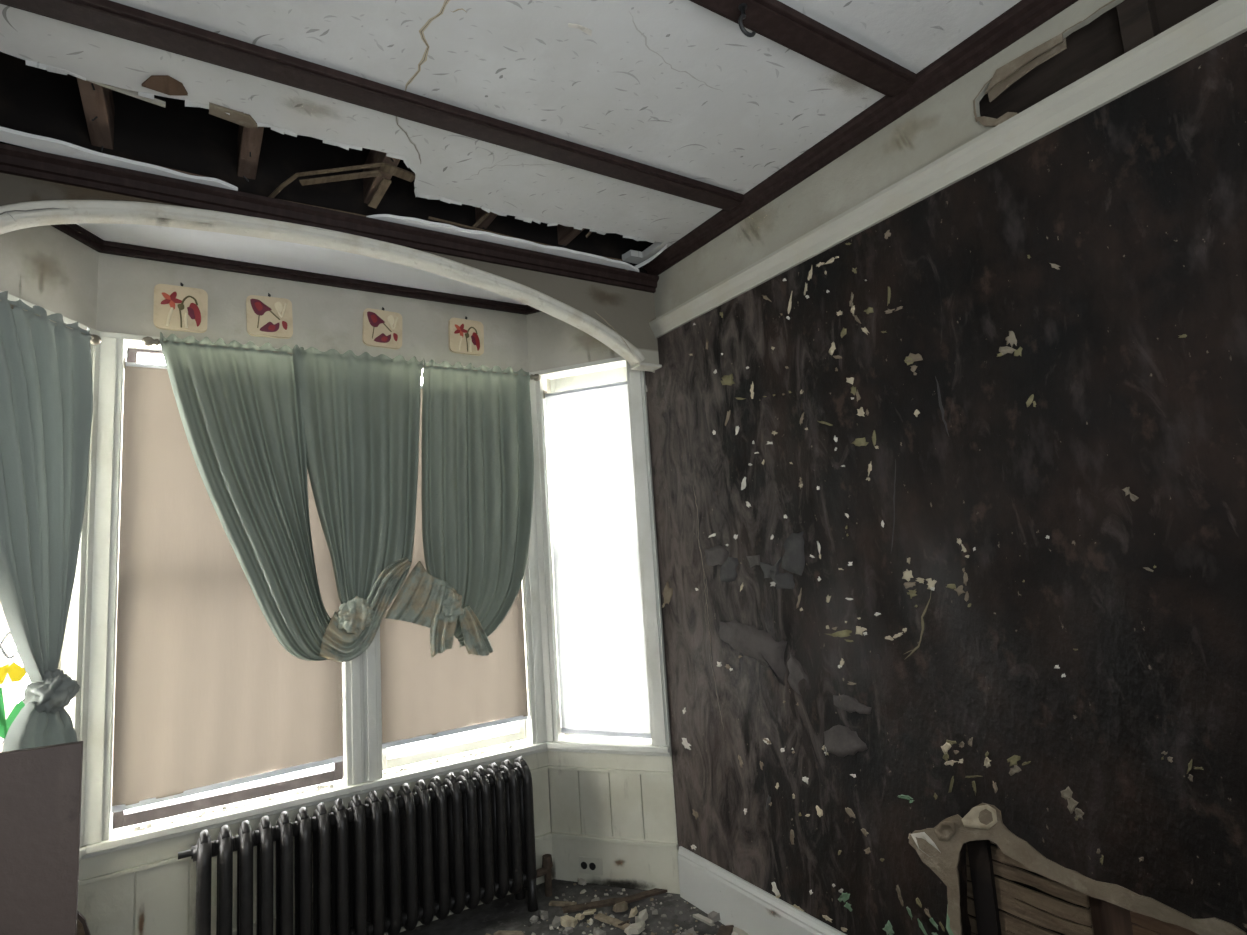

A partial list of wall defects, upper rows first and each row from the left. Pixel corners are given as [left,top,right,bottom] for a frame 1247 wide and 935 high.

crack [395,0,466,164]
peeling [826,612,881,642]